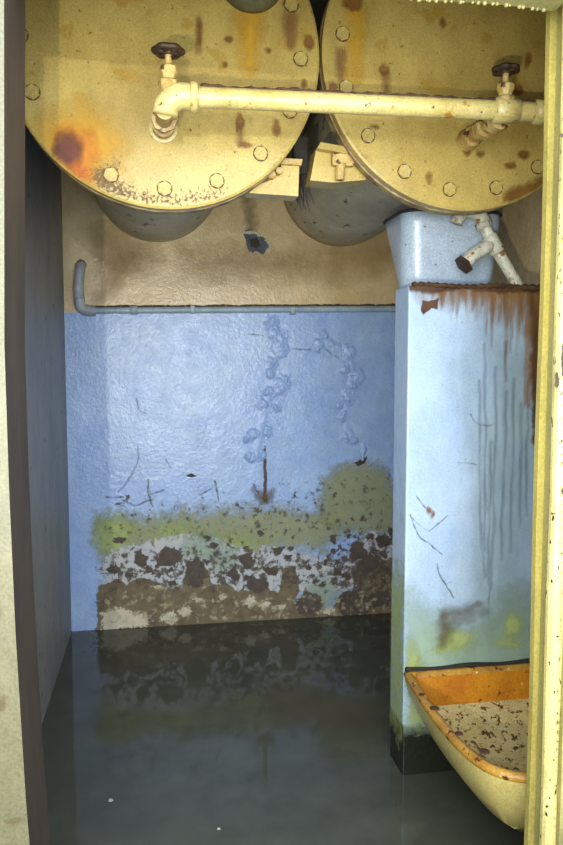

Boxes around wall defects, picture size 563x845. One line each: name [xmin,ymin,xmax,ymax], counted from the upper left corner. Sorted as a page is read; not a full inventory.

spalling [243,229,272,254]
corrosion [409,281,540,443]
spalling [95,528,393,630]